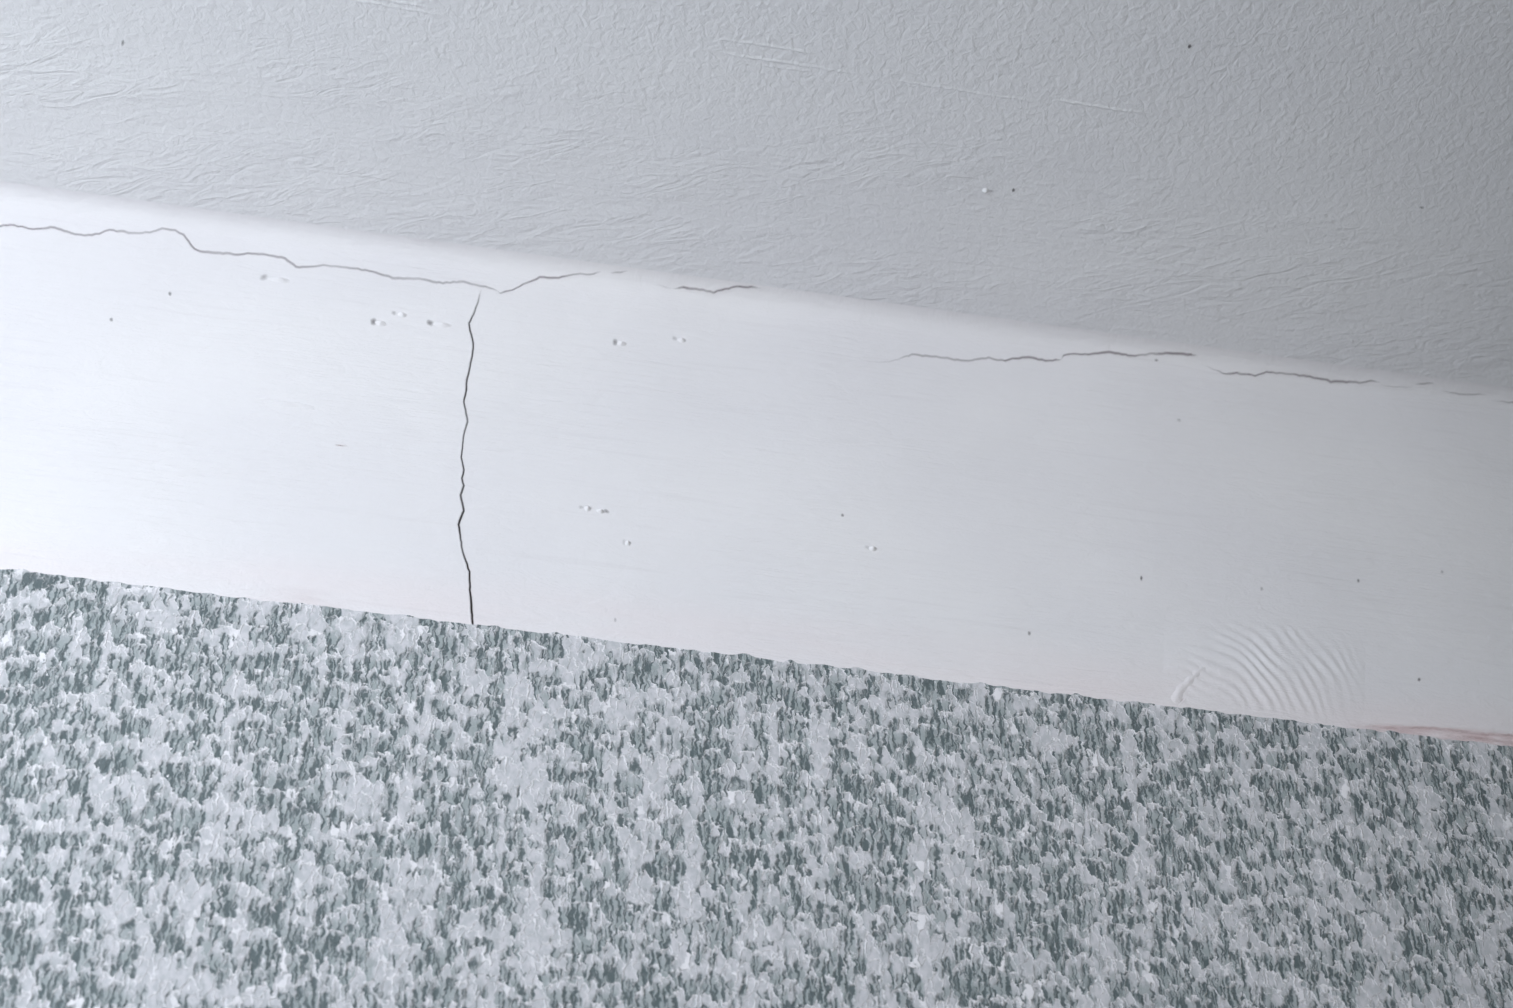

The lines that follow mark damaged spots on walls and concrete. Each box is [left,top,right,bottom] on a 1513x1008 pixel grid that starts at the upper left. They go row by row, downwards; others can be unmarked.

crack [0,224,762,625]
crack [861,351,1435,390]